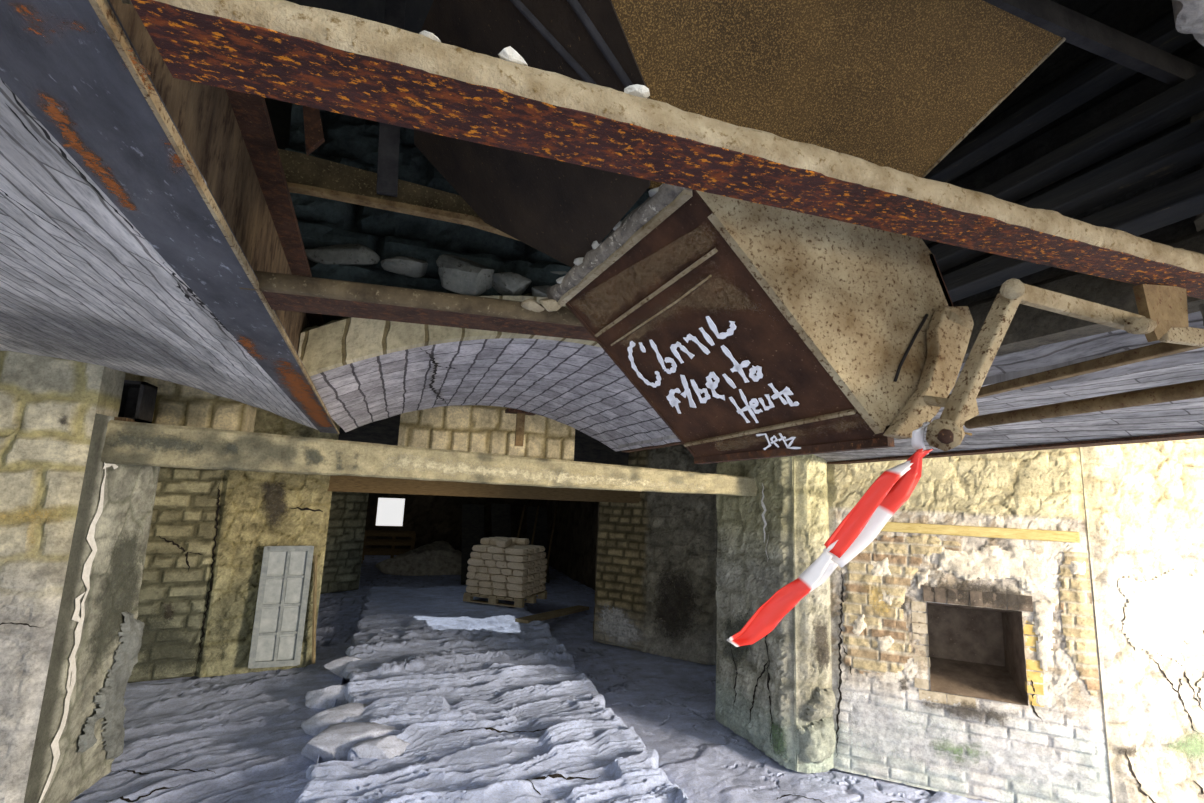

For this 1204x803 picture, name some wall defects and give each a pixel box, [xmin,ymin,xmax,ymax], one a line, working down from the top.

rust [38,93,136,211]
rust [236,334,331,427]
crack [420,348,455,405]
crack [0,621,40,629]
leakage [39,462,141,803]
spalling [841,534,1100,696]
crack [731,634,773,743]
crack [1151,653,1204,732]
crack [1126,755,1156,803]